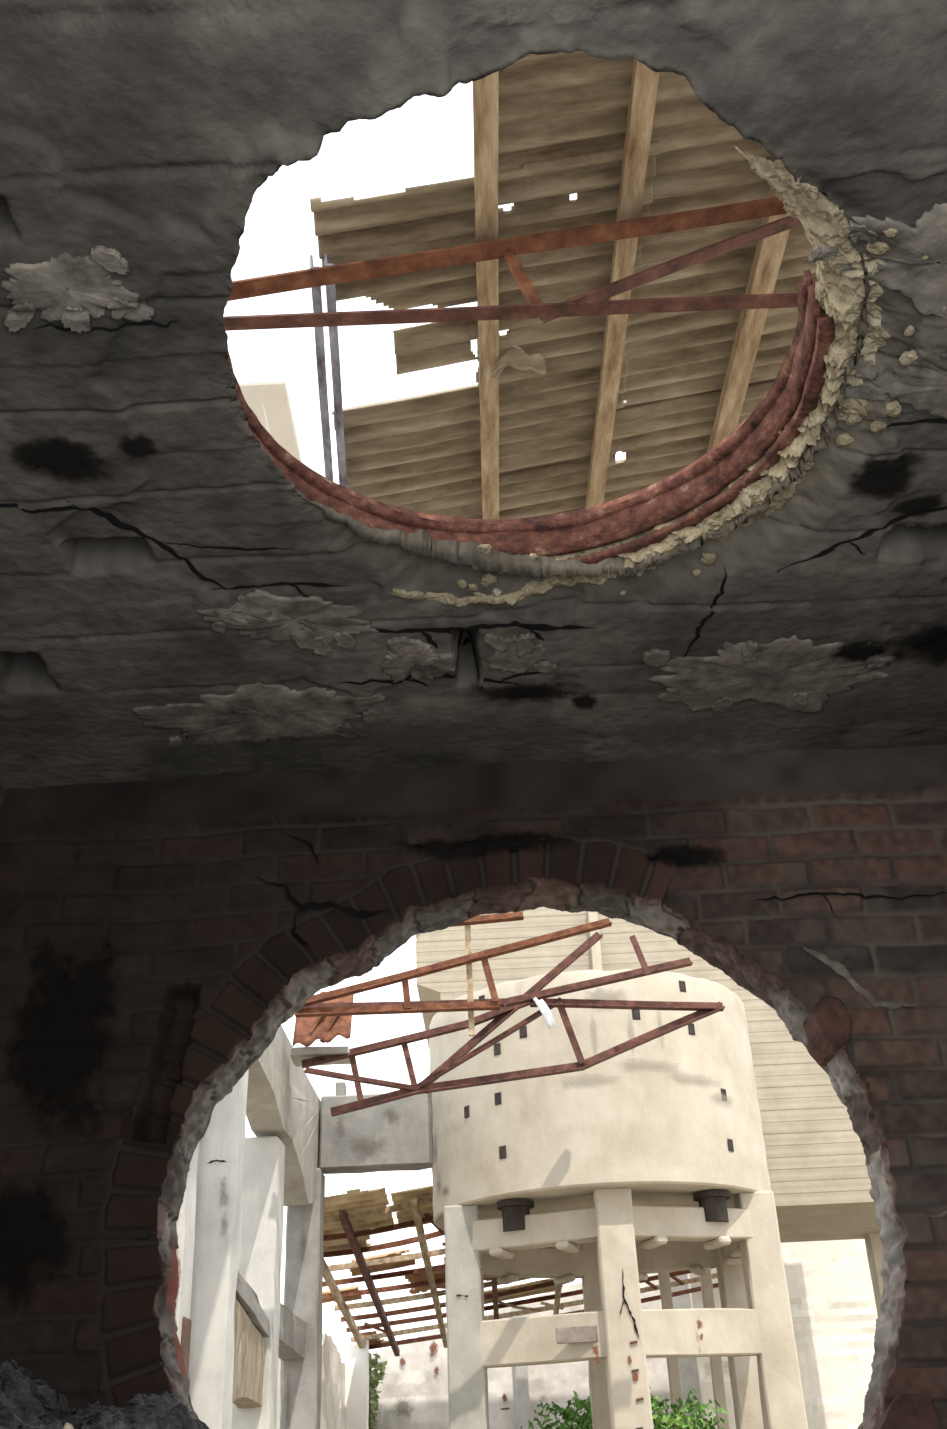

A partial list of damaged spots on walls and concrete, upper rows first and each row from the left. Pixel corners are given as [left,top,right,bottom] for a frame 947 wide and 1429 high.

peeling [0,245,155,334]
spalling [391,146,947,607]
crack [0,500,351,597]
crack [777,506,947,573]
crack [684,568,727,657]
peeling [641,635,898,713]
crack [620,1270,640,1340]